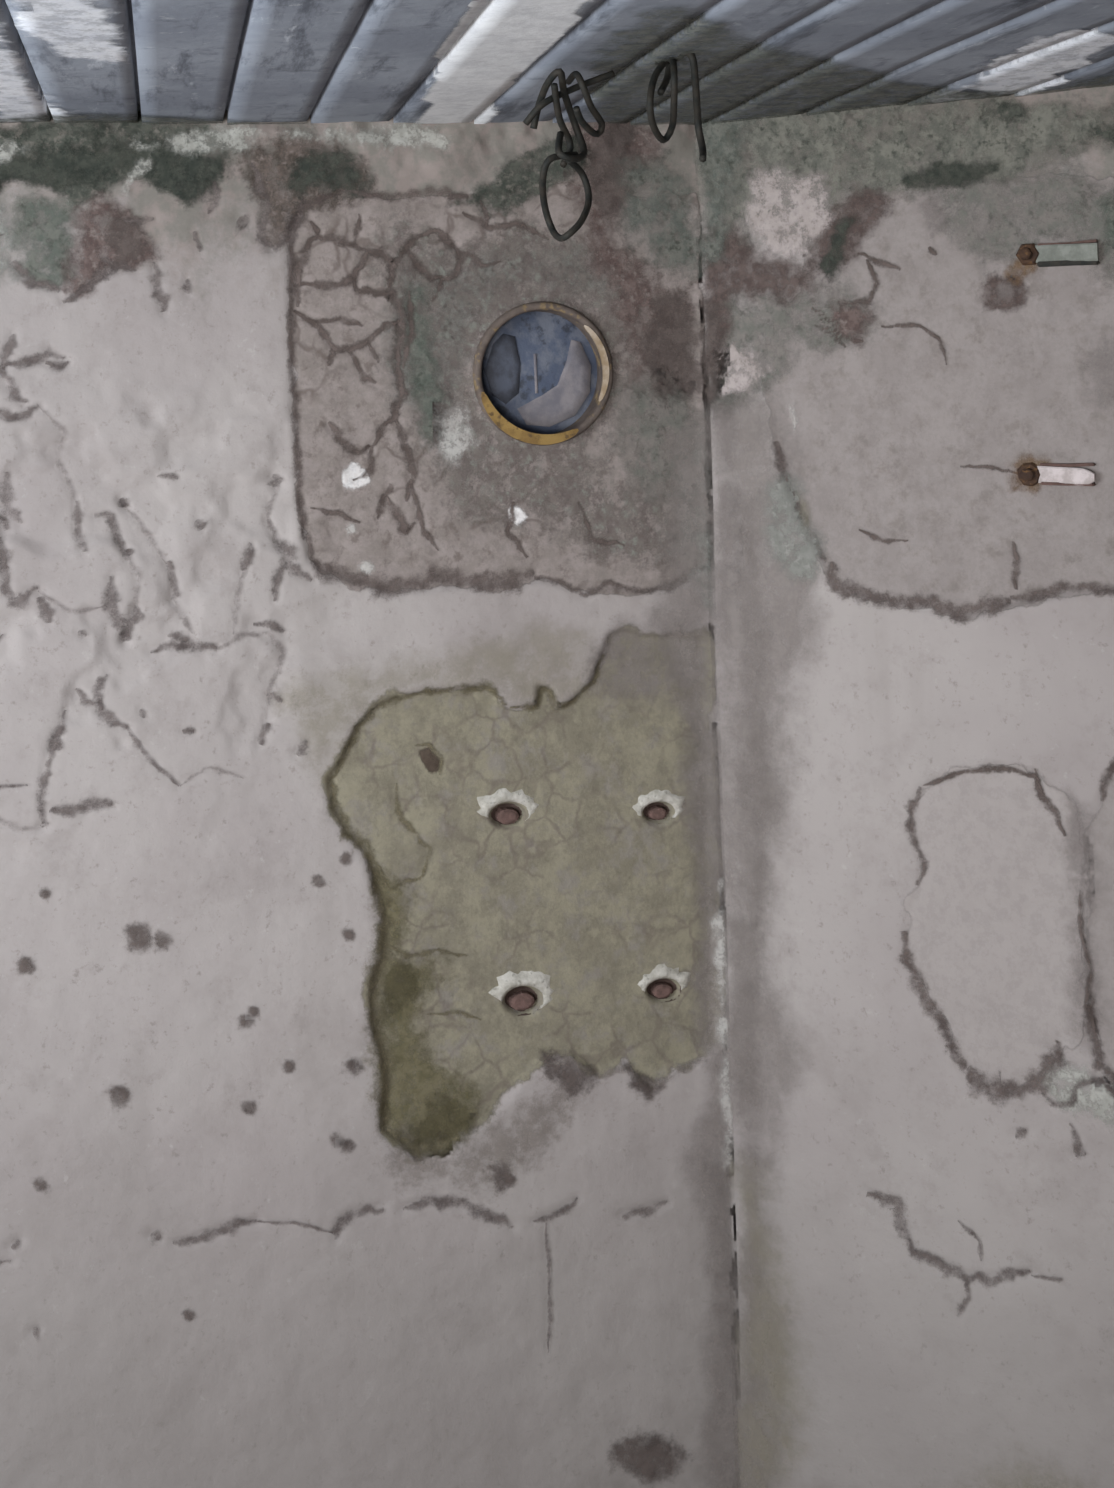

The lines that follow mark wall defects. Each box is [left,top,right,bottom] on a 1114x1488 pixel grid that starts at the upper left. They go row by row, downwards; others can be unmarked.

crack [0,162,545,558]
spalling [983,276,1026,310]
crack [0,472,312,745]
crack [0,675,181,823]
water stain [369,10,1114,1488]
spalling [18,957,35,973]
spalling [124,925,168,949]
spalling [321,625,727,1158]
spalling [110,1086,129,1103]
spalling [1041,1066,1114,1157]
crack [152,1198,578,1350]
crack [866,1192,1062,1312]